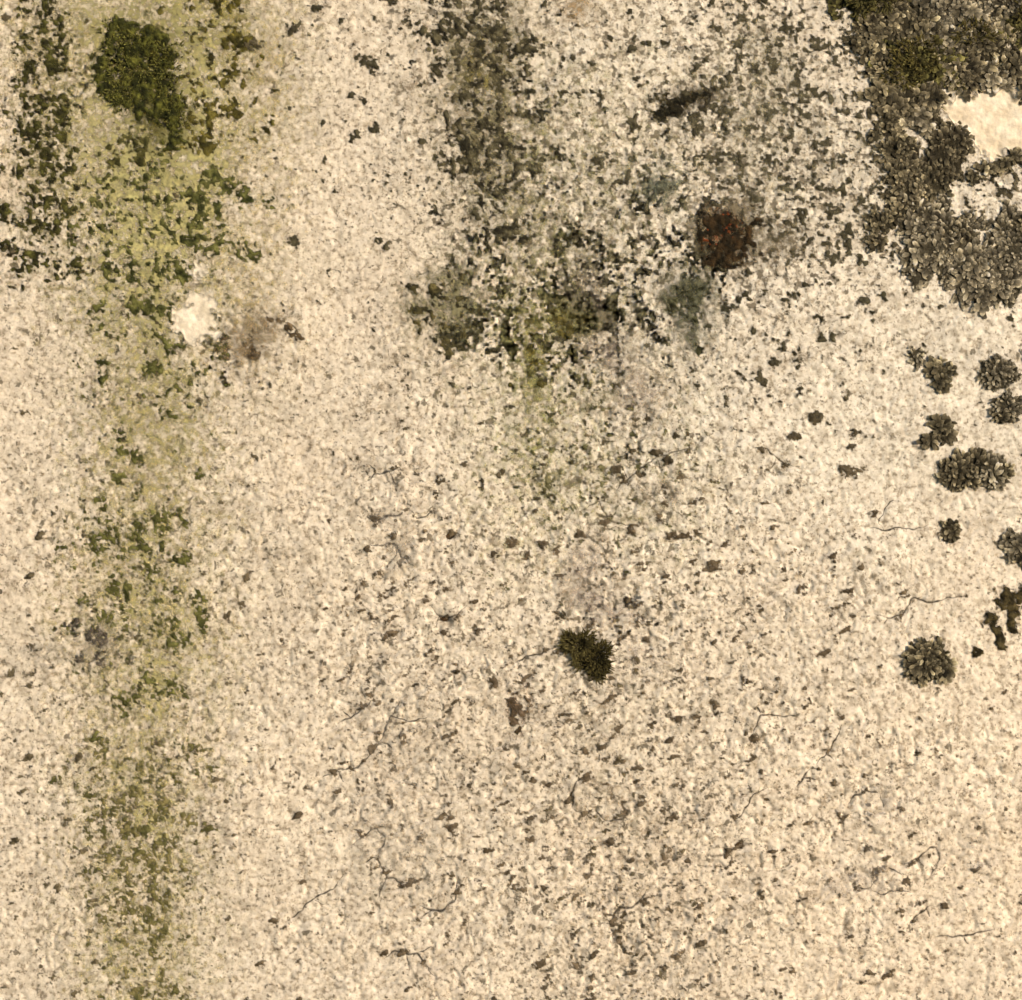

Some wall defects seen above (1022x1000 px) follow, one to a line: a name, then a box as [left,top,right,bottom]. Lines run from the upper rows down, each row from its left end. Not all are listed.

mould [649,88,724,120]
rust [694,198,792,269]
damp [216,316,305,362]
damp [56,0,266,973]